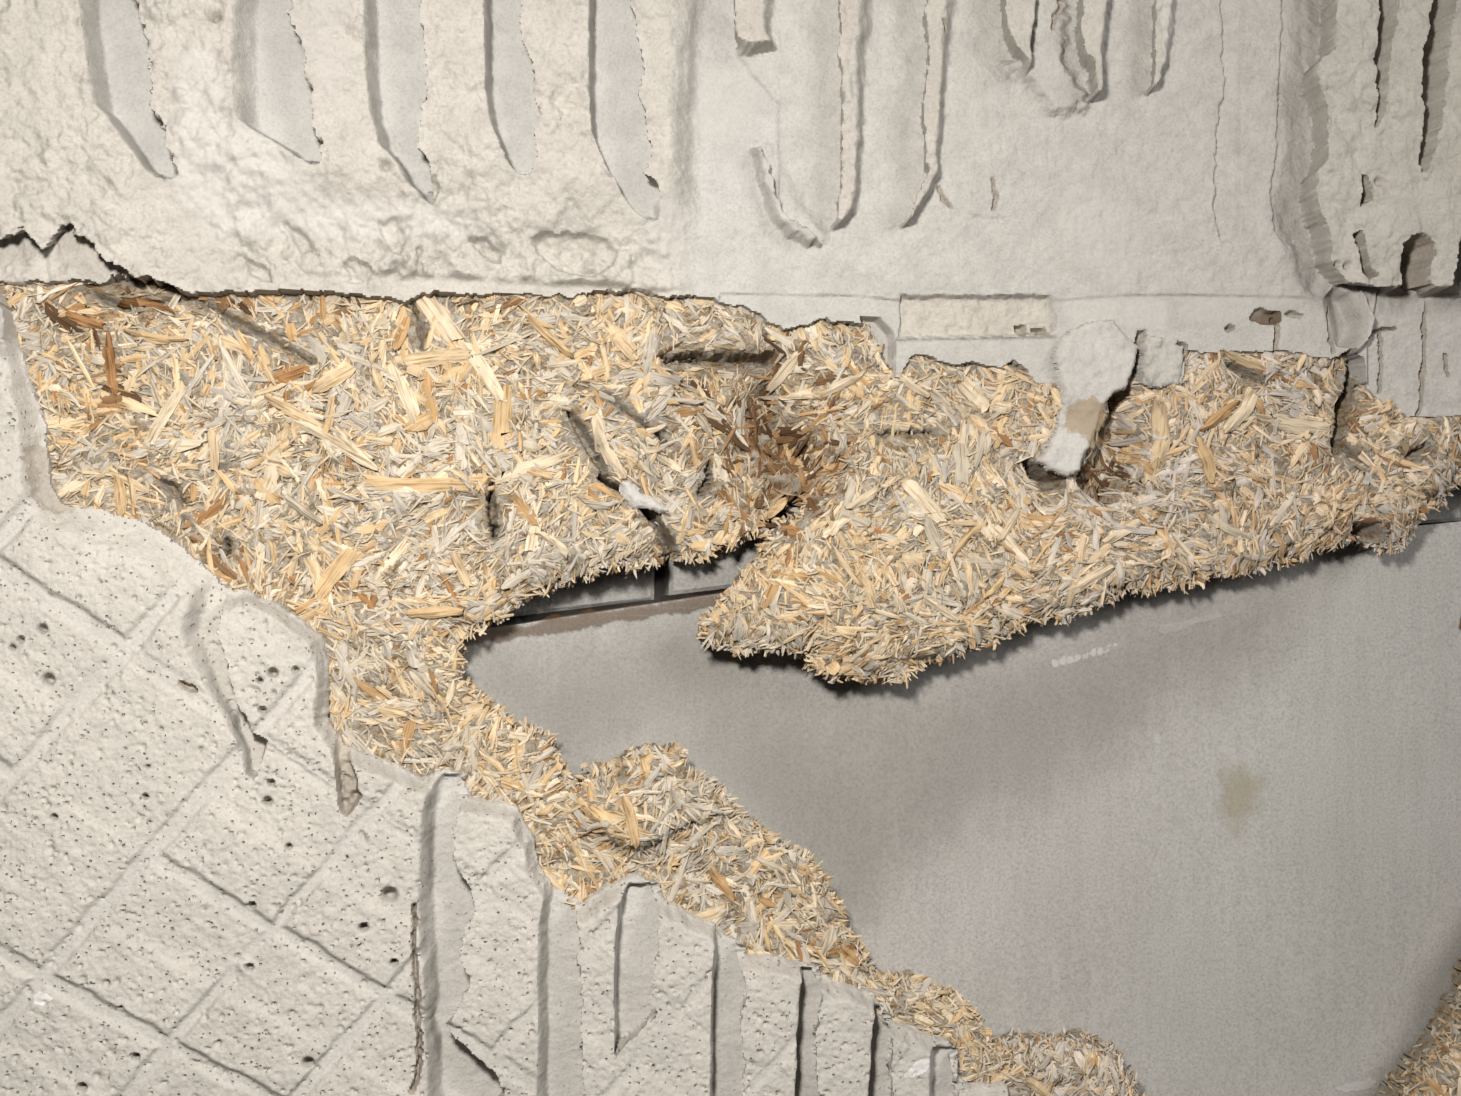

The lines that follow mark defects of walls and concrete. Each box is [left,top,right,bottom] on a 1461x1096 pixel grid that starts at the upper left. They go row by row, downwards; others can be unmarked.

spalling [21,445,74,514]
spalling [619,345,848,561]
peeling [1013,319,1152,508]
crack [407,902,424,1095]